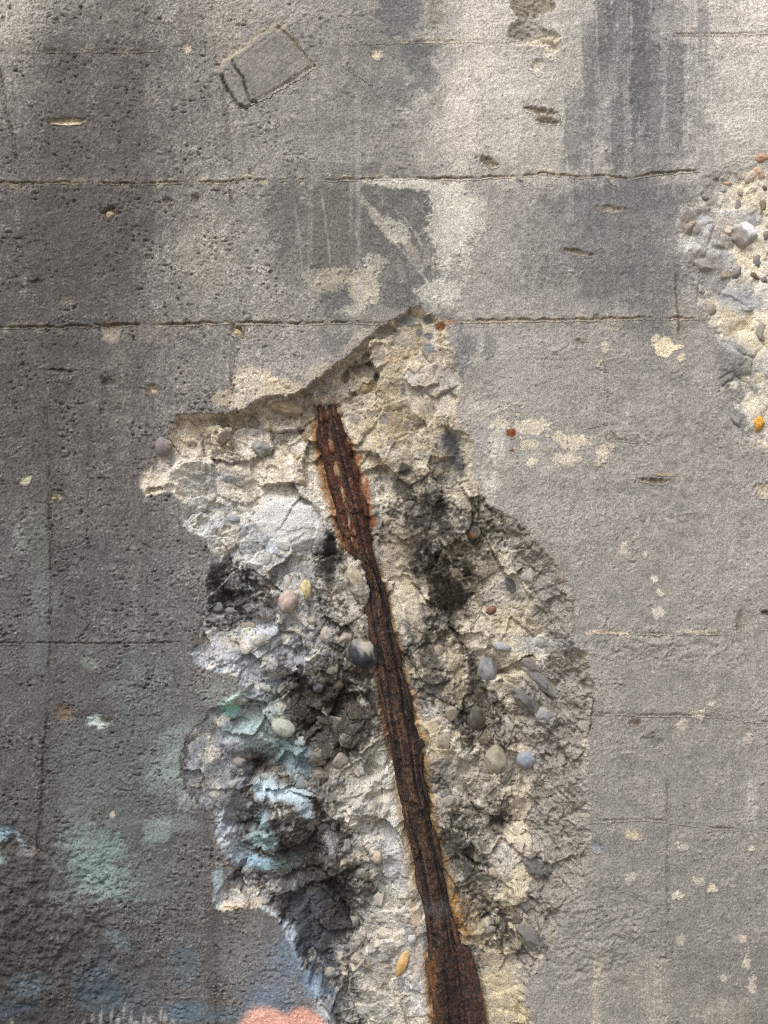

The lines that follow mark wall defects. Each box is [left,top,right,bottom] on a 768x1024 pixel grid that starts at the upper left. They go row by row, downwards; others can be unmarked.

spalling [676,147,768,456]
spalling [139,0,629,1024]
rust [307,405,487,1024]
peeling [616,538,648,558]
peeling [650,574,667,620]